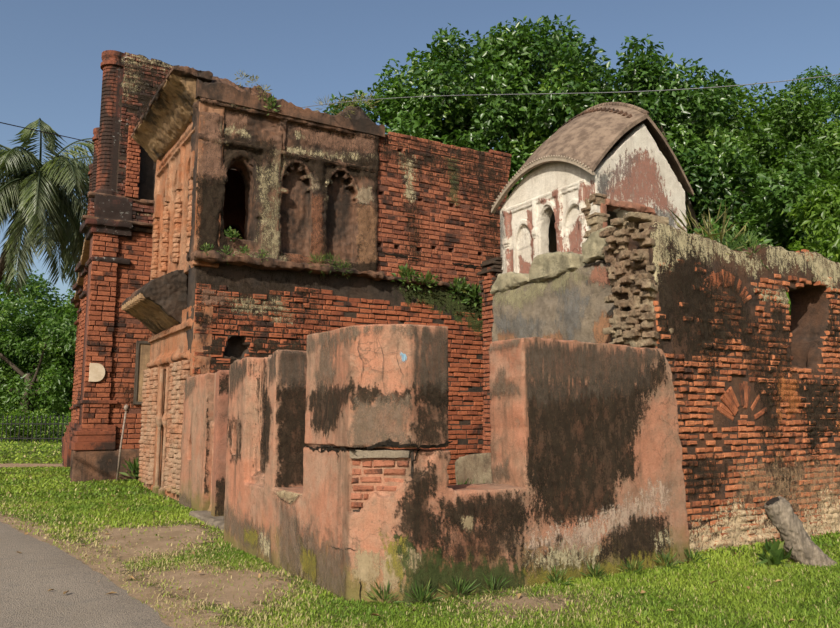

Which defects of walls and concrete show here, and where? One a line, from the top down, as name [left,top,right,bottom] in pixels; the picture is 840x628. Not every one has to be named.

leakage [195,130,510,272]
flaking render [502,210,512,238]
flaking render [506,209,534,274]
leakage [597,172,611,195]
flaking render [538,147,679,254]
leakage [184,207,840,604]
flaking render [349,449,414,512]